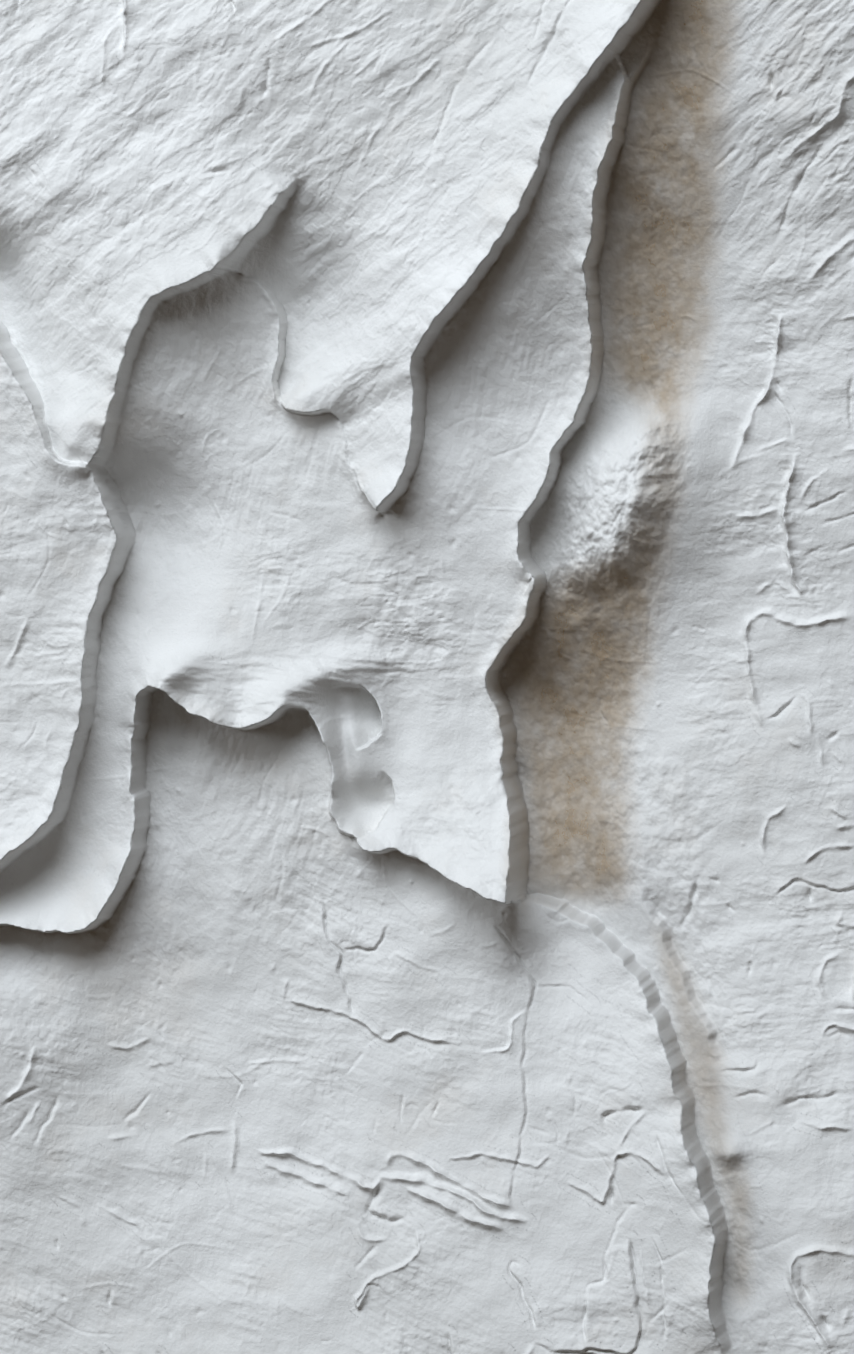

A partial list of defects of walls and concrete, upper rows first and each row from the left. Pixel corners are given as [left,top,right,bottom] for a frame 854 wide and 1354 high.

flaking render [0,0,656,962]
crack [470,916,600,1202]
crack [711,1048,848,1115]
crack [502,1124,692,1354]